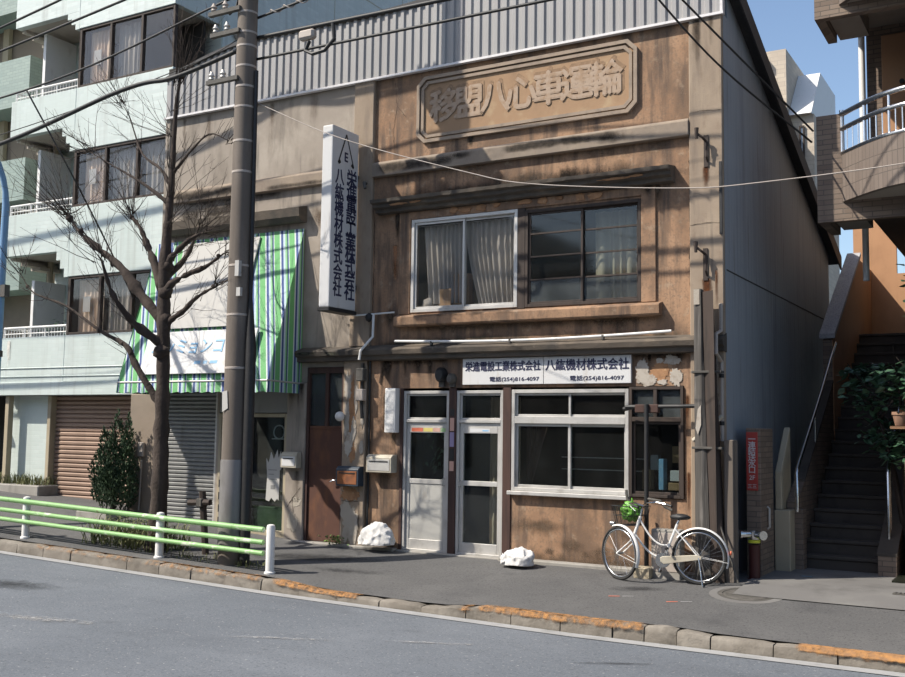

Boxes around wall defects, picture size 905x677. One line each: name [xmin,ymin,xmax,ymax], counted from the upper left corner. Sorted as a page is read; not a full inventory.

peeling [635,354,683,387]
peeling [344,371,365,464]